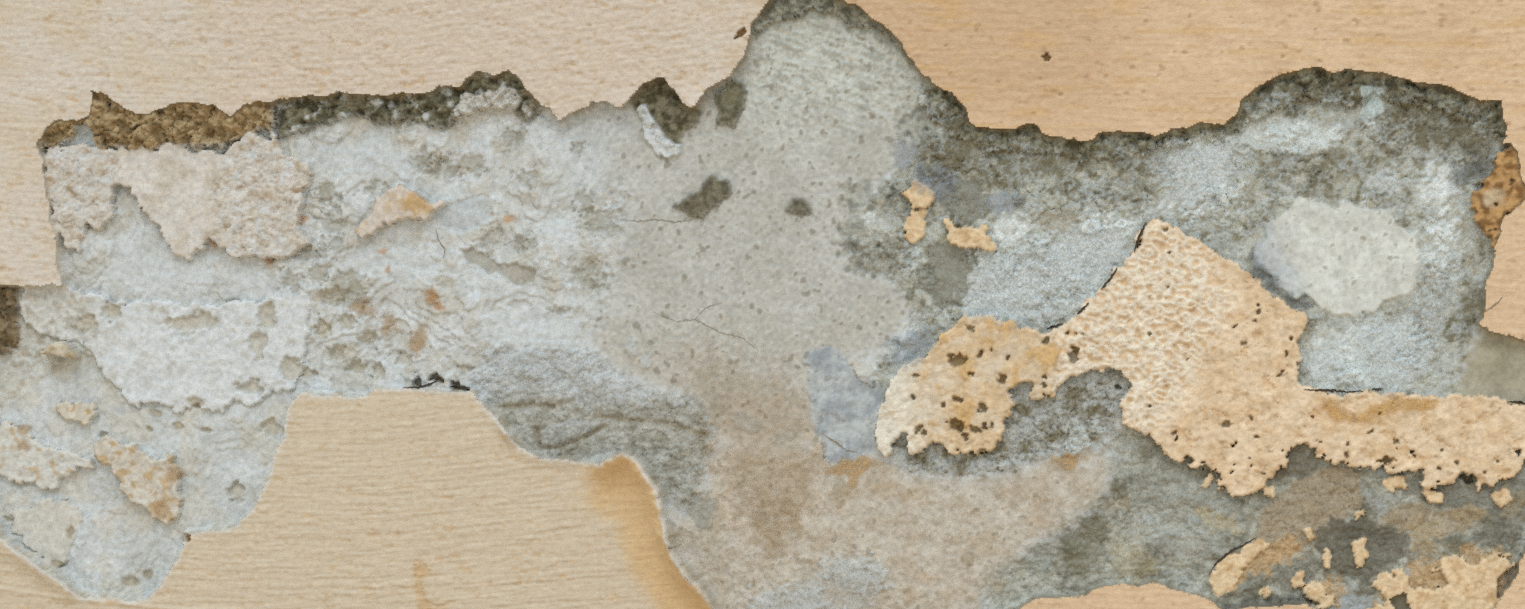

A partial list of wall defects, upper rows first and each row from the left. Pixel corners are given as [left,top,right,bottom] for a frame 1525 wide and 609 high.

leakage [1162,143,1241,204]
flaking render [0,69,719,609]
leakage [965,228,1124,322]
spalling [566,0,1525,609]
leakage [1361,271,1453,395]
leakage [831,457,873,487]